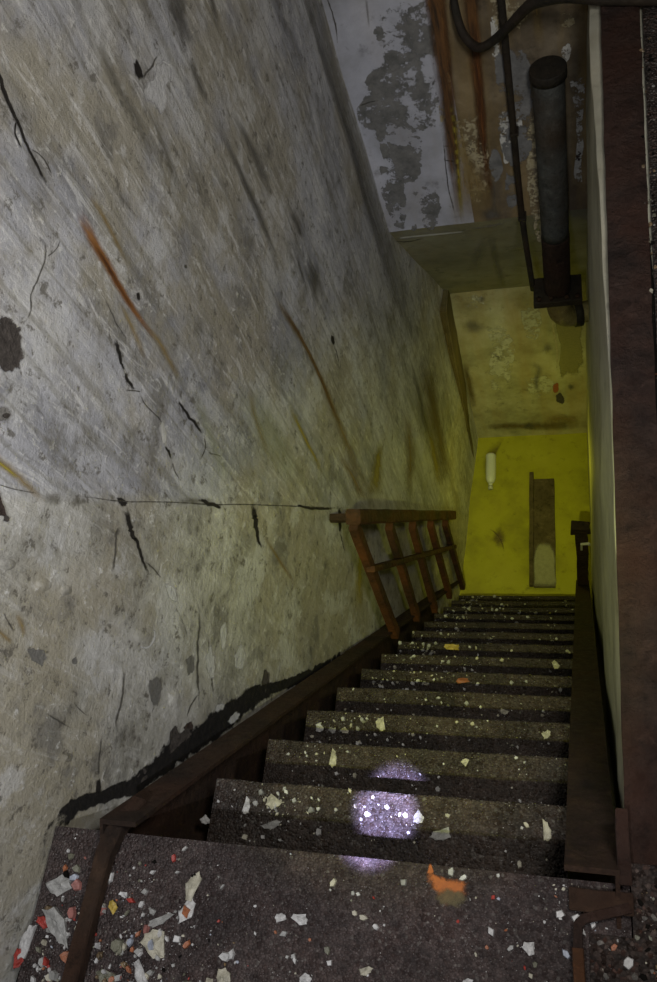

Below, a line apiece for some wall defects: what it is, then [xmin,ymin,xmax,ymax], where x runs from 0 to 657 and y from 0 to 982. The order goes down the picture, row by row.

crack [0,74,51,180]
rust [425,0,458,173]
peeling [357,0,541,242]
rust [465,0,491,185]
rust [84,227,144,343]
spalling [0,407,10,421]
spalling [0,316,23,372]
crack [108,305,220,477]
spalling [0,497,10,522]
crack [96,498,345,576]